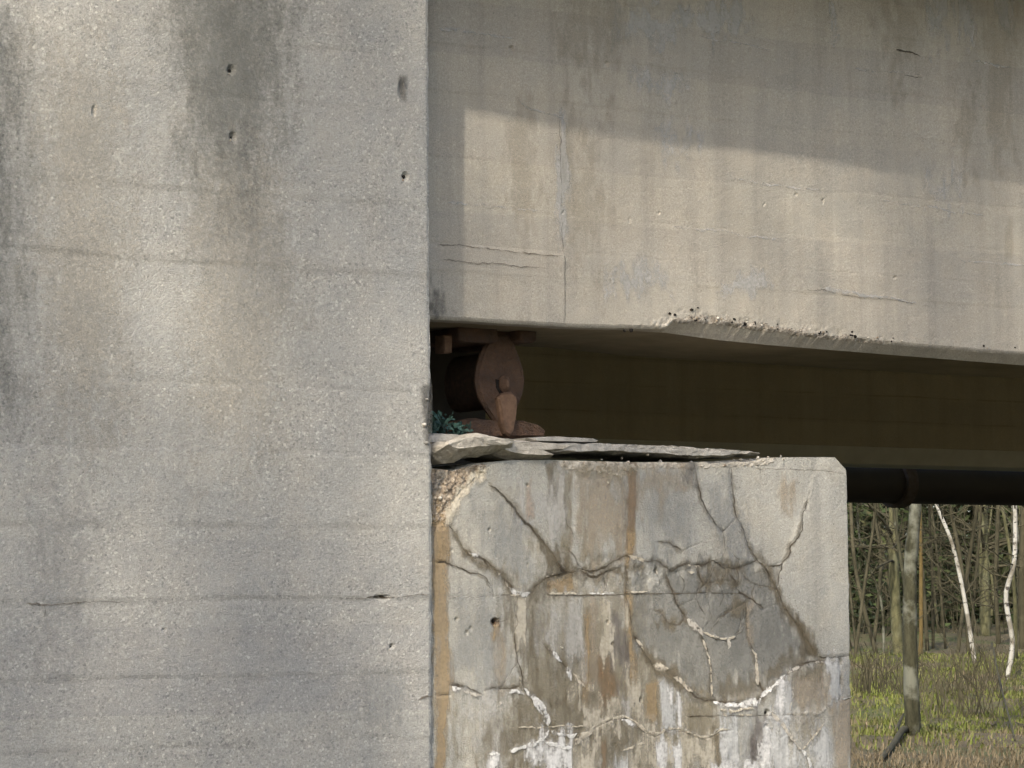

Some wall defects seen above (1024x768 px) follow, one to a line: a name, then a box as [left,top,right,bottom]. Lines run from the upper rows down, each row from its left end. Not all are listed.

crack [439,227,566,281]
spalling [649,307,903,344]
spalling [431,464,486,524]
corrosion [626,463,636,566]
corrosion [432,500,451,768]
corrosion [514,585,528,652]
corrosion [583,591,657,722]
crack [419,462,852,768]
damp [511,557,842,768]
damp [486,742,499,768]